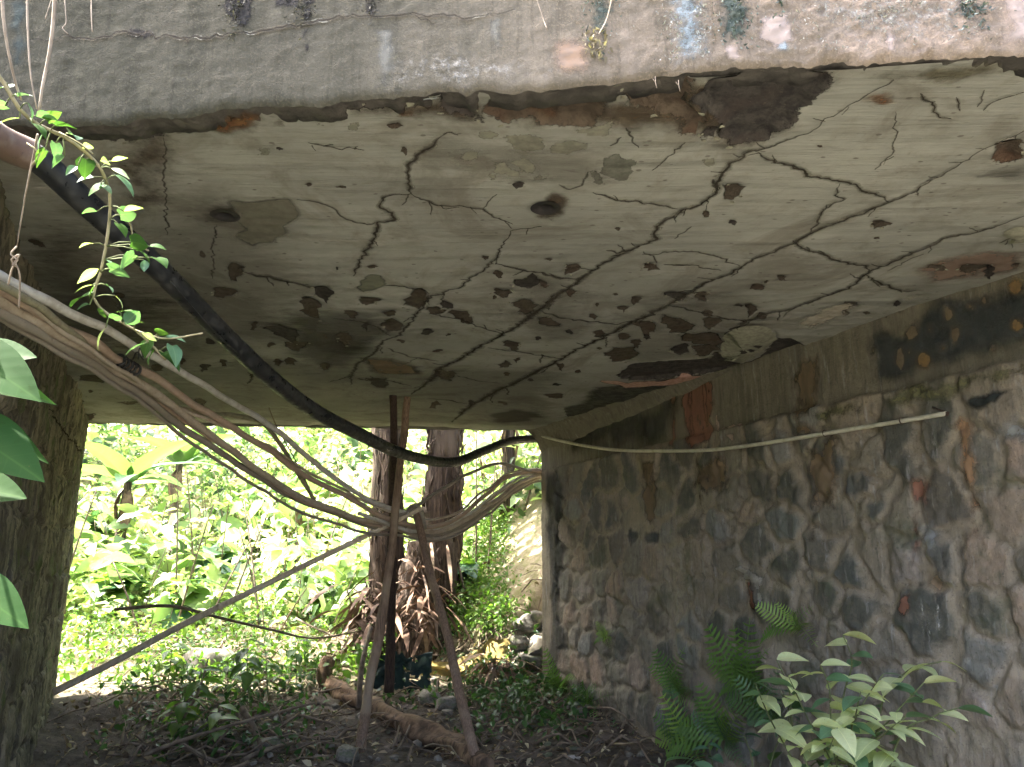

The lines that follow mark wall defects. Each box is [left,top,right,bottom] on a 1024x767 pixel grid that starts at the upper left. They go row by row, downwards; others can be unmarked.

spalling [613,70,833,149]
crack [161,135,169,233]
damp [540,194,566,217]
spalling [250,322,311,366]
crack [242,271,325,288]
spalling [300,286,334,322]
spalling [344,288,474,343]
spalling [490,270,573,340]
crack [297,81,1024,422]
spalling [589,292,804,382]
damp [873,291,1024,379]
rust [668,382,714,448]